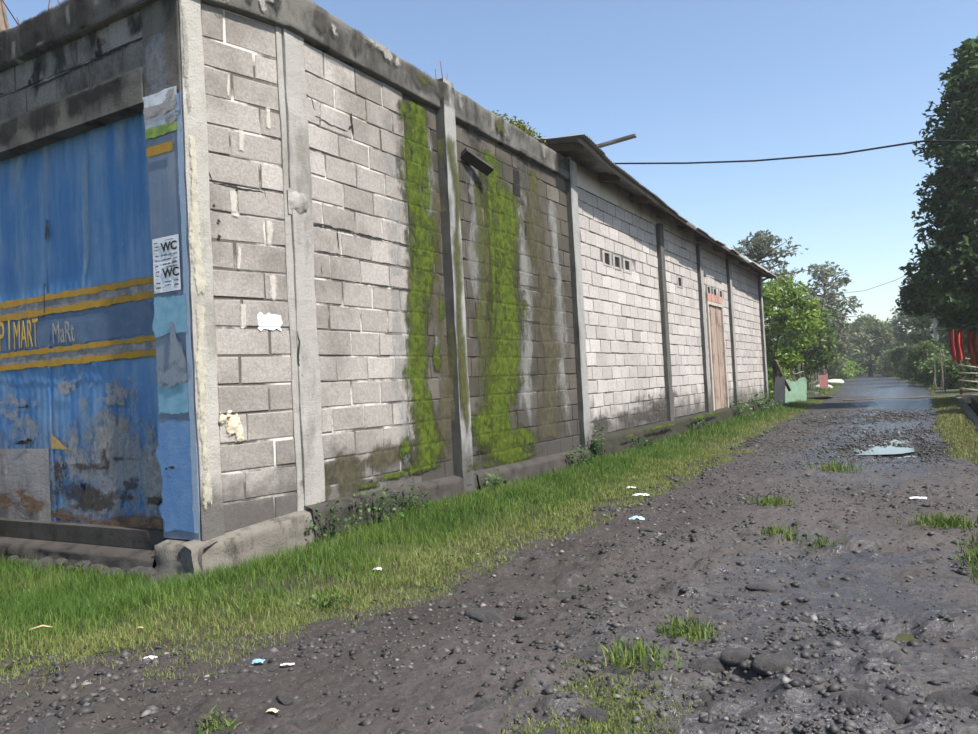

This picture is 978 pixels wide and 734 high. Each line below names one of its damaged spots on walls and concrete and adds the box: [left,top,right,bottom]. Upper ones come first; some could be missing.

damp [0,0,119,144]
damp [128,13,169,96]
peeling [143,6,191,124]
damp [467,114,483,144]
flaking render [156,136,212,509]
damp [512,126,563,441]
peeling [0,385,38,448]
peeling [50,372,162,525]